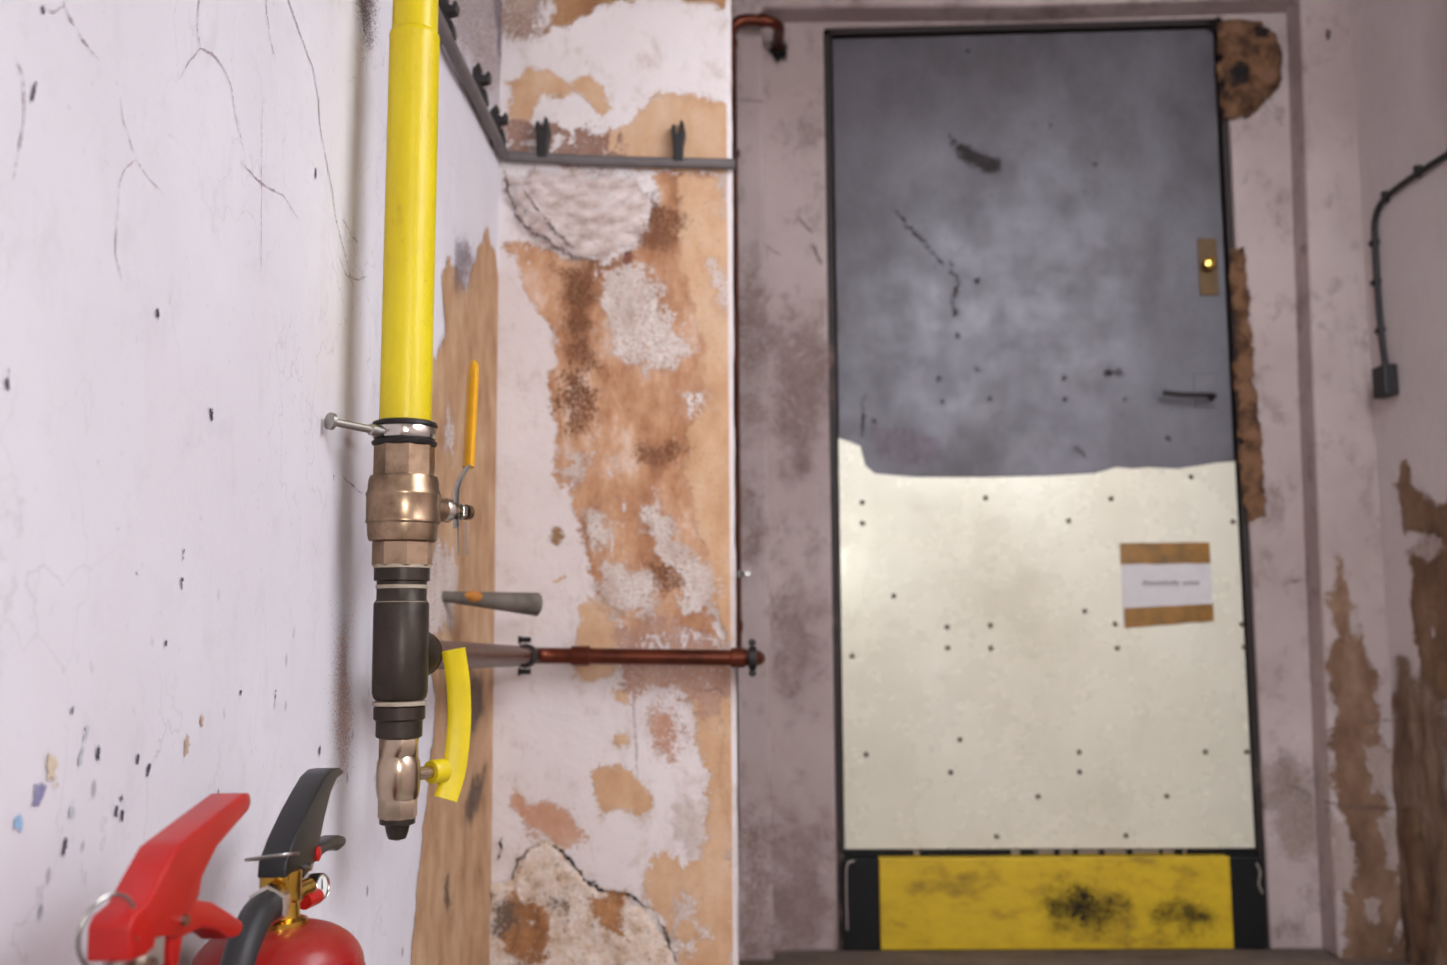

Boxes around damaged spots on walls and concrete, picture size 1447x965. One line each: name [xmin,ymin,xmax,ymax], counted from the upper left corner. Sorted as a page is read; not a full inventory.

crack [13,63,25,180]
crack [49,1,97,57]
crack [115,98,165,278]
crack [183,0,298,260]
crack [266,2,367,299]
peeling [540,0,726,36]
flaking render [1206,15,1283,121]
flaking render [1229,247,1267,524]
peeling [411,64,733,965]
peeling [1392,460,1447,708]
peeling [1322,550,1405,960]